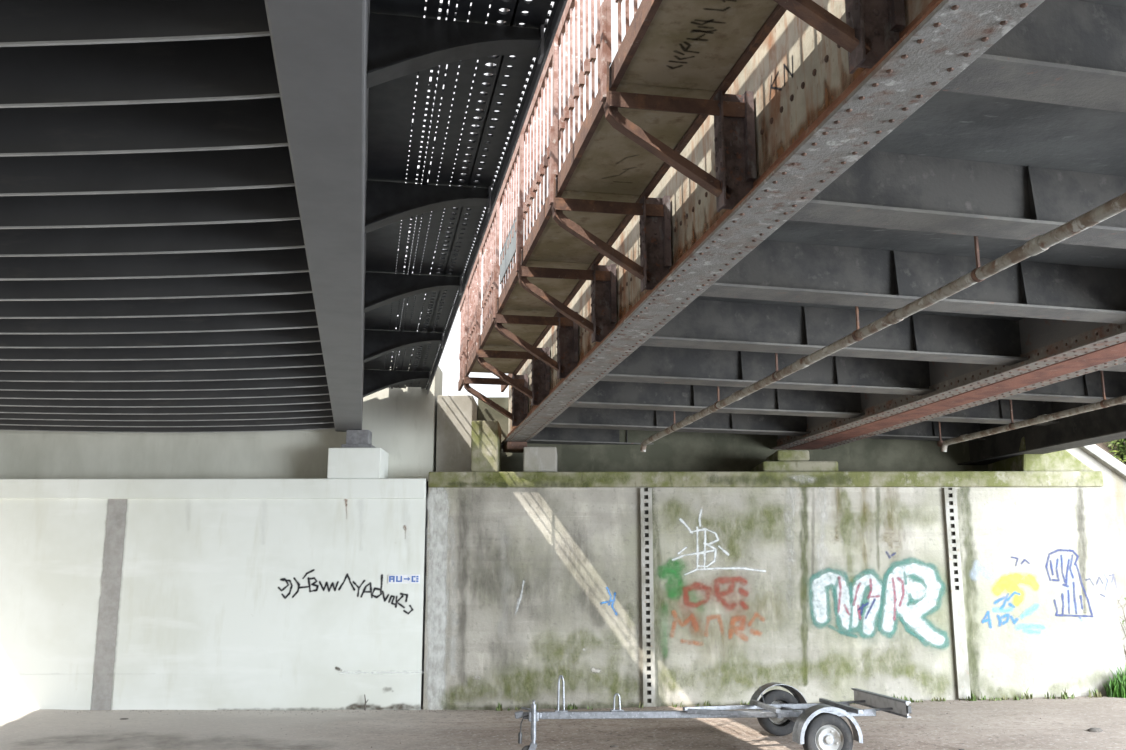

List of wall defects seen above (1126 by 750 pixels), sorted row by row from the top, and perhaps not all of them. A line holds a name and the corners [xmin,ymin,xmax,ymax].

rust [762,67,866,167]
water stain [787,487,822,685]
water stain [964,528,978,696]
water stain [1065,490,1086,612]